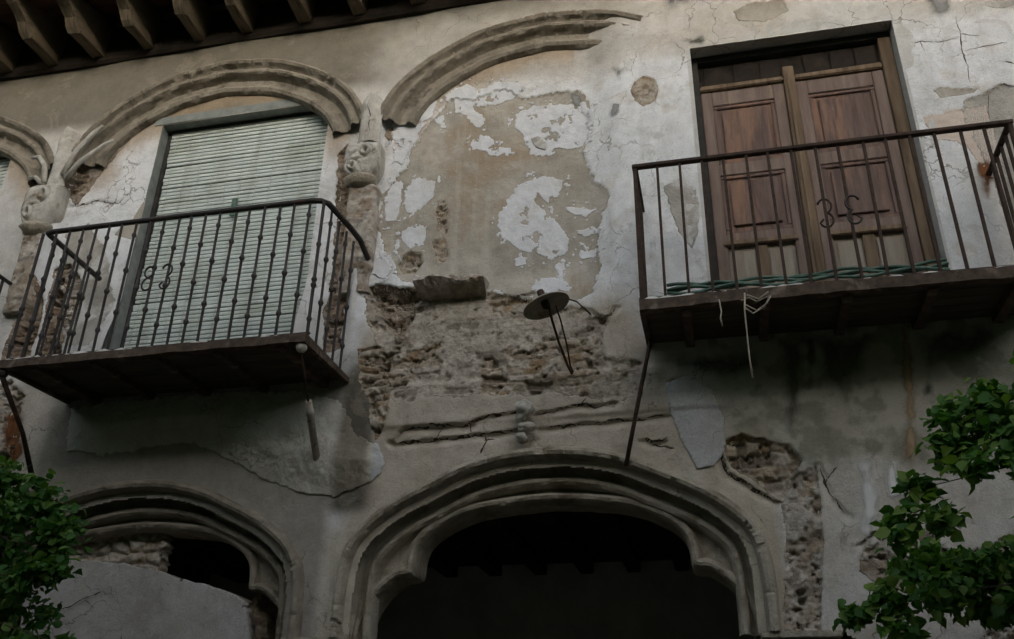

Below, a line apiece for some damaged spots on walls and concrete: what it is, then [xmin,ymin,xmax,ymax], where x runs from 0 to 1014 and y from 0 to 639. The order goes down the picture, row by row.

peeling [733,0,789,22]
peeling [630,76,659,107]
crack [915,21,1014,117]
peeling [923,84,1014,226]
peeling [1,223,116,360]
flaking render [322,144,350,353]
peeling [357,77,652,440]
flaking render [0,375,26,471]
spalling [859,530,947,593]